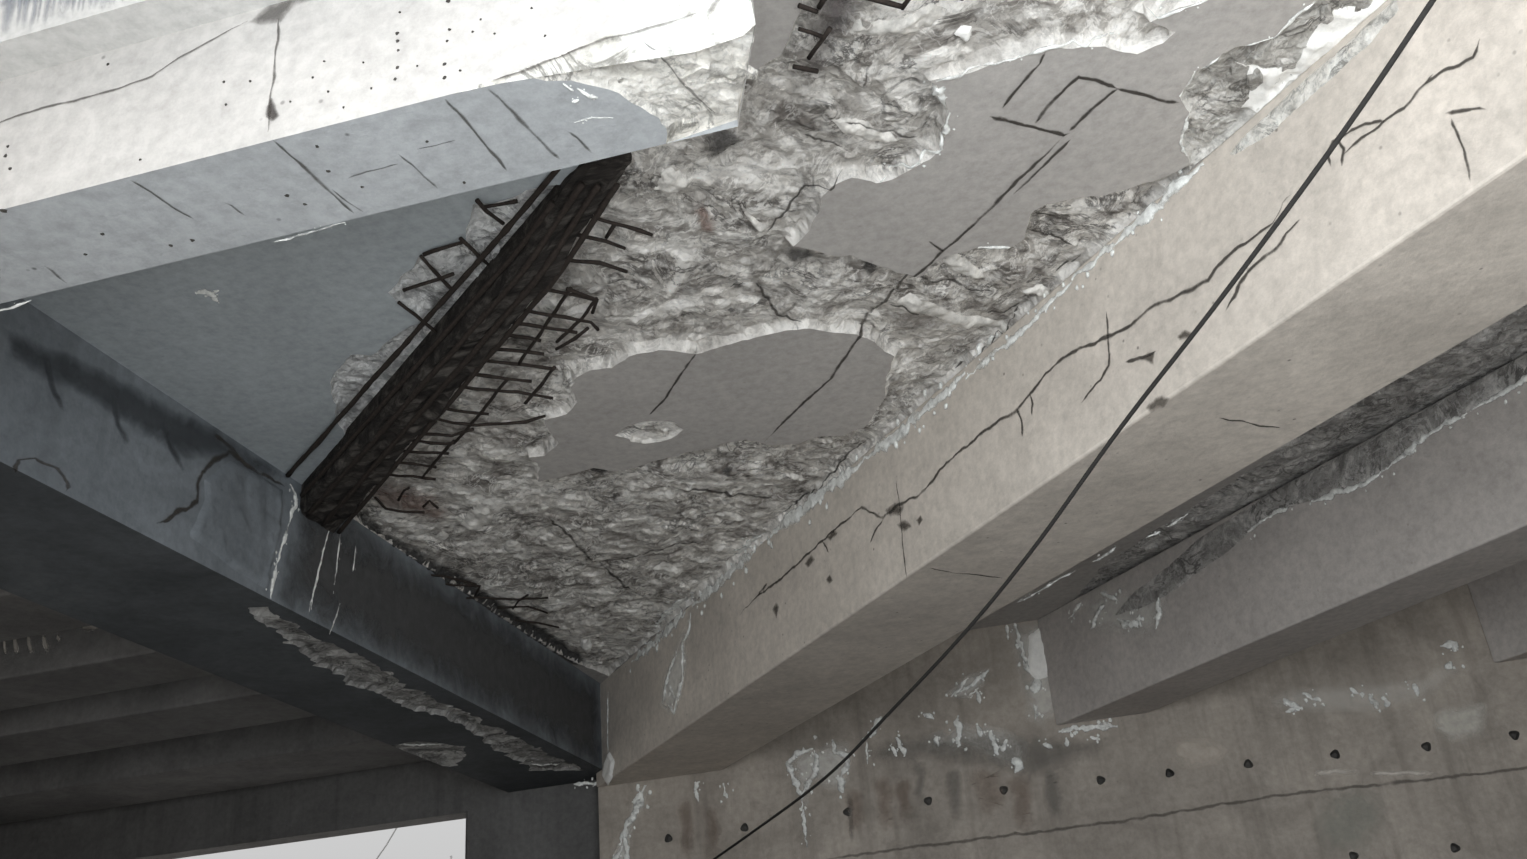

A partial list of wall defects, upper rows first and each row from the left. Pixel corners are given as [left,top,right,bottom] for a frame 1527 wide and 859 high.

rust [792,0,832,74]
rust [867,0,911,10]
leakage [267,102,277,120]
crack [1328,42,1479,164]
crack [1449,107,1482,178]
crack [768,54,1176,433]
spalling [330,0,1399,676]
crack [745,209,1298,608]
spalling [1074,305,1527,616]
spalling [248,607,581,771]
leakage [786,716,907,845]
leakage [918,711,1023,773]